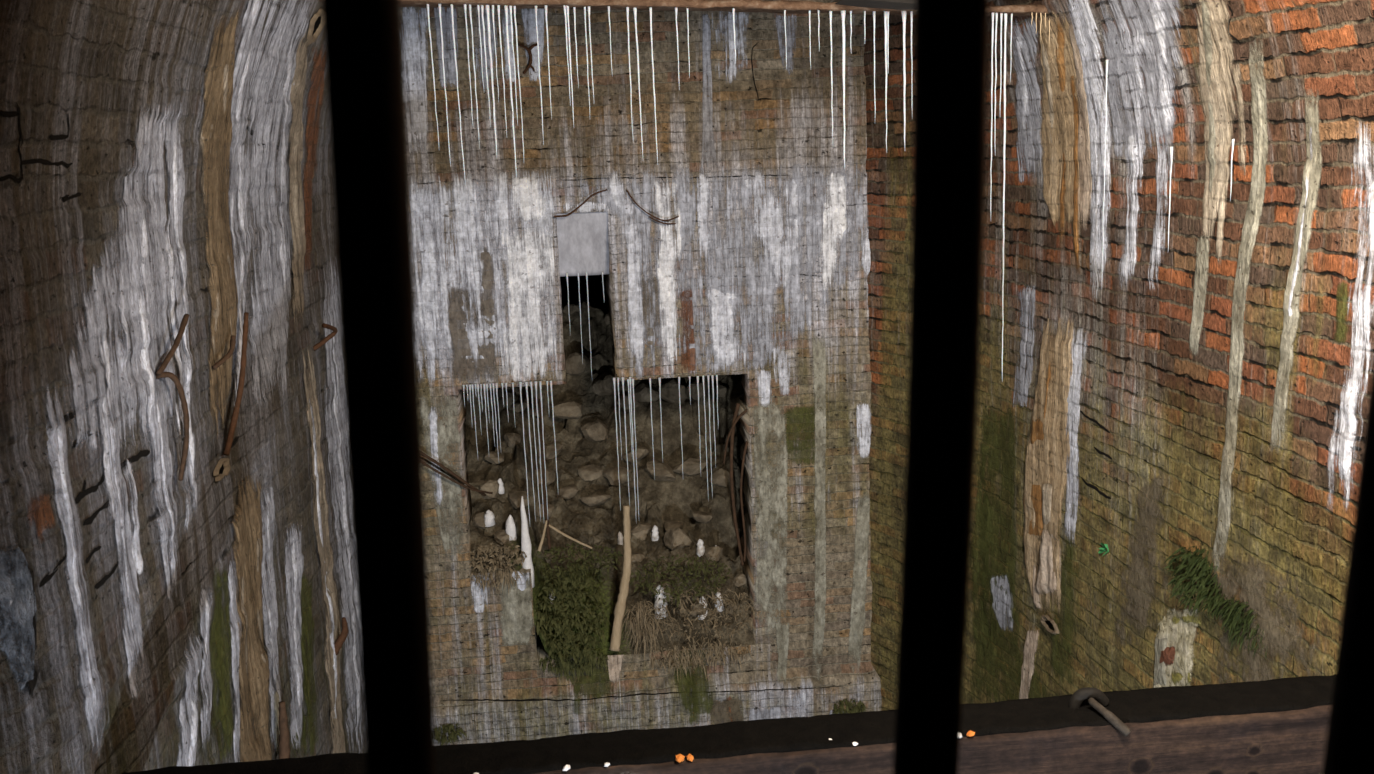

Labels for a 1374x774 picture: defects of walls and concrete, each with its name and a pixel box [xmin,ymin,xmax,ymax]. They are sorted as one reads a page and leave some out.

spalling [0,547,39,696]
damp [47,390,103,744]
damp [104,410,144,698]
damp [119,105,213,598]
damp [208,0,308,418]
damp [177,257,364,766]
damp [447,183,556,381]
damp [640,181,681,372]
peeling [1023,483,1060,594]
damp [1056,0,1144,297]
damp [1189,0,1268,567]
damp [1271,99,1322,446]